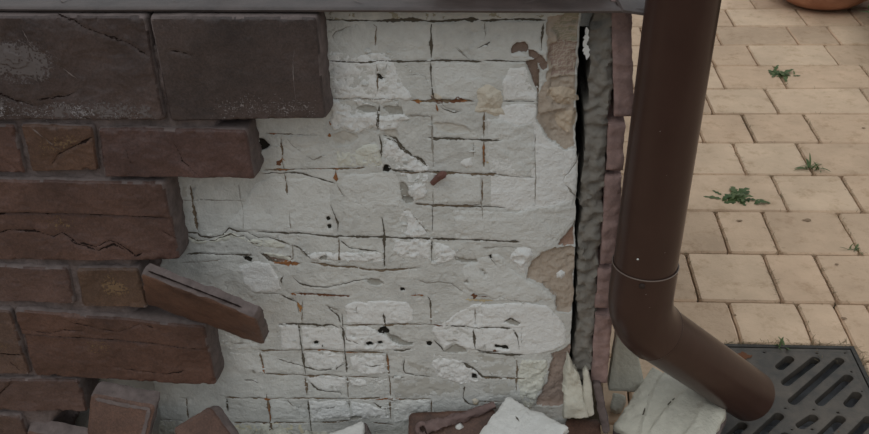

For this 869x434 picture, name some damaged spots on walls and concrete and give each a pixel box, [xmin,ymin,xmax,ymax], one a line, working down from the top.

water stain [0,37,58,86]
water stain [0,96,156,122]
flaking render [239,256,281,292]
flaking render [189,176,333,248]
crack [0,13,545,431]
flaking render [307,251,383,262]
flaking render [328,13,590,409]
flaking render [222,300,430,431]